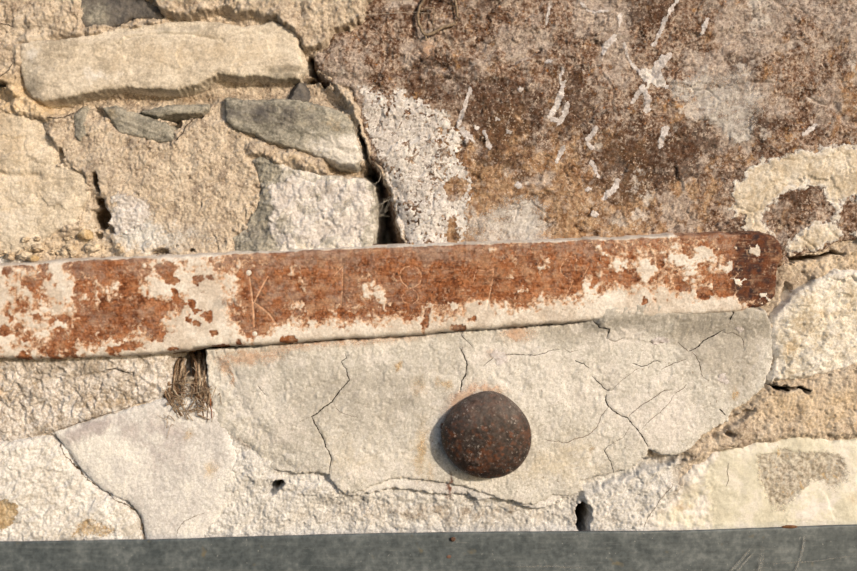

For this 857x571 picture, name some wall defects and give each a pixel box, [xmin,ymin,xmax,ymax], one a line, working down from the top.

crack [300,338,354,473]
corrosion [507,329,525,341]
crack [441,312,744,472]